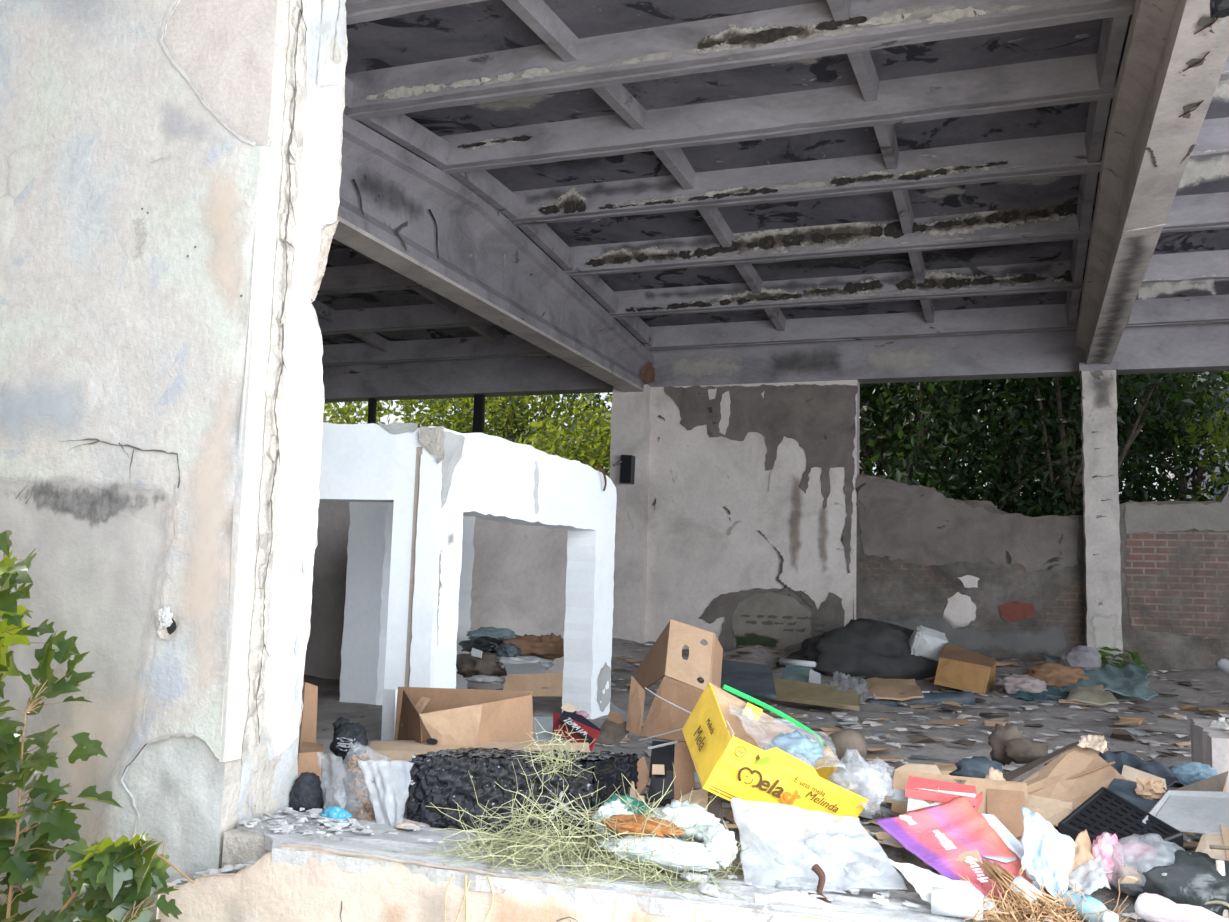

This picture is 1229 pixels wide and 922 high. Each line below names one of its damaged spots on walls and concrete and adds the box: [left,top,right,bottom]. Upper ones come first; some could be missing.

spalling [366,5,1025,100]
spalling [1182,51,1210,72]
spalling [1179,71,1229,119]
spalling [529,161,1061,215]
spalling [1179,149,1229,187]
spalling [586,204,1077,267]
spalling [626,270,1085,312]
spalling [1139,275,1223,299]
water stain [34,484,129,523]
water stain [791,482,800,556]
peeling [640,363,1080,628]
crack [758,530,813,608]